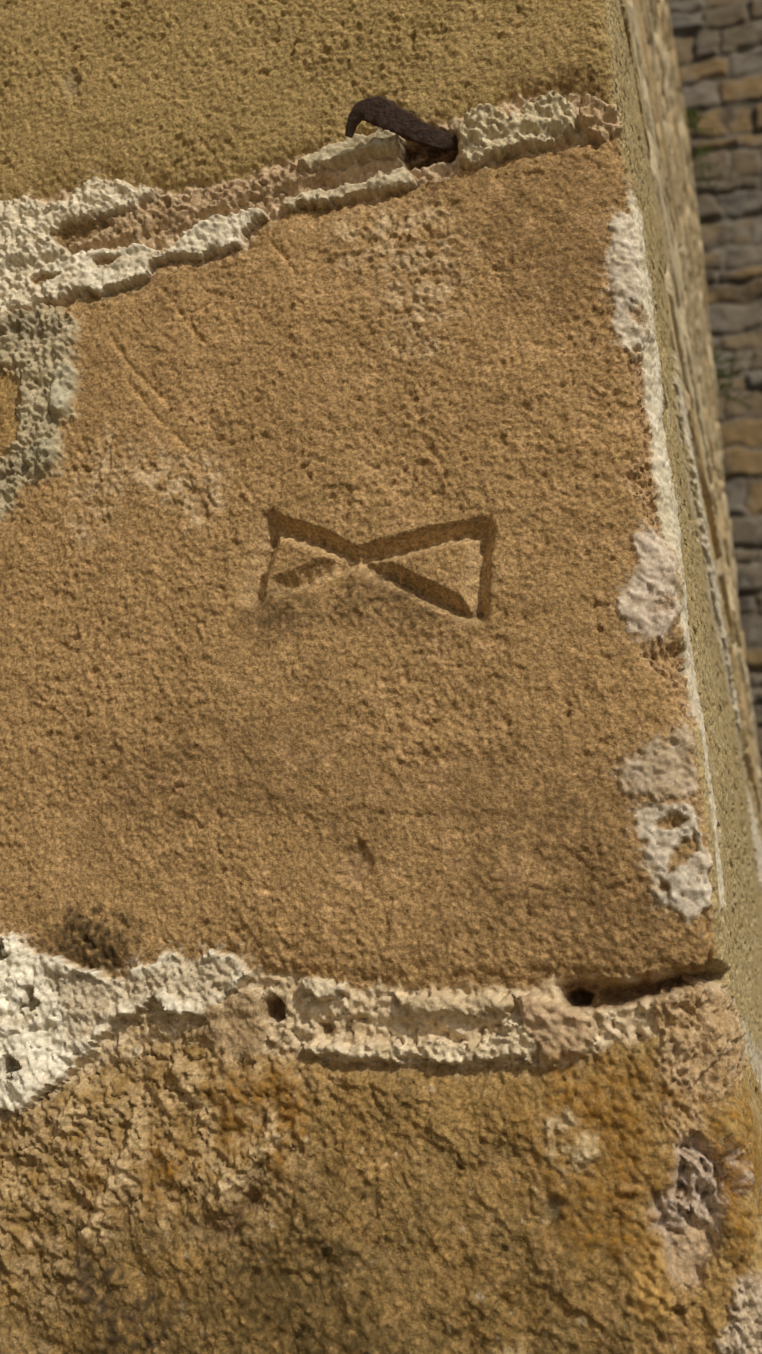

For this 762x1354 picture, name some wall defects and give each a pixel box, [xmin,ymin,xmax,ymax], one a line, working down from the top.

flaking render [606,210,714,922]
crack [559,962,728,1010]
crack [269,1041,599,1081]
spalling [713,1266,762,1354]